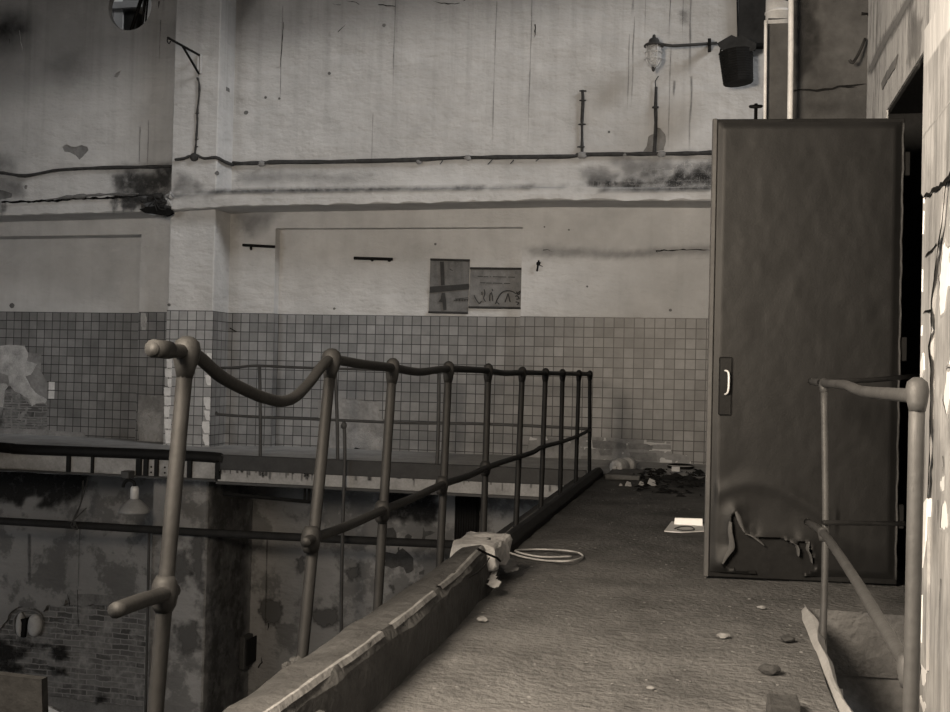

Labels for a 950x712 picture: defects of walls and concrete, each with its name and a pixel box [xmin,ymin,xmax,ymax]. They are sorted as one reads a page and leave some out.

flaking render [63,145,88,160]
water stain [115,168,172,209]
water stain [590,167,711,187]
peeling [938,222,950,319]
peeling [0,345,86,437]
crack [924,182,947,521]
peeling [942,358,950,419]
water stain [0,471,88,508]
peeling [922,472,949,568]
flaking render [0,594,146,712]